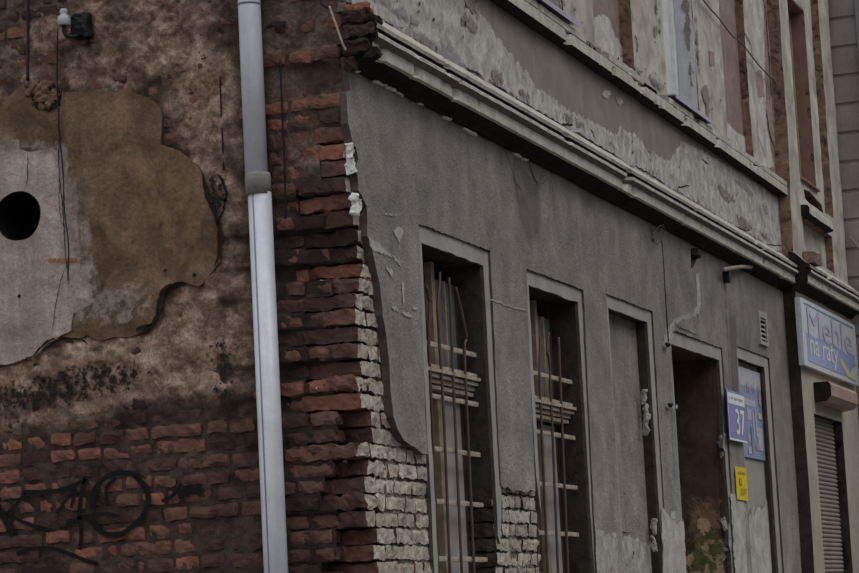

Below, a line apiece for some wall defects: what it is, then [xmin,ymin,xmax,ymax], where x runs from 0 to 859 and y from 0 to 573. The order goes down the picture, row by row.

peeling [351,0,782,253]
flaking render [289,127,432,573]
spalling [640,389,651,436]
flaking render [468,489,541,573]
peeling [595,493,772,573]